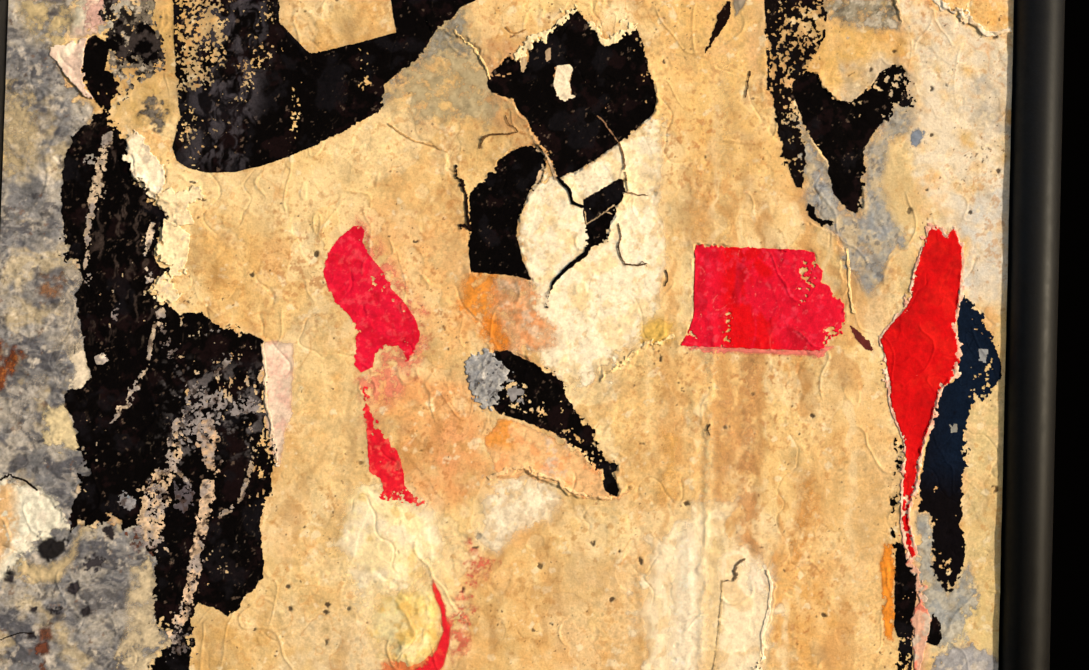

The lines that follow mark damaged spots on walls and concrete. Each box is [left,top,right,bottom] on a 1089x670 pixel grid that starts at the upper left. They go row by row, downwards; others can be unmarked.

crack [388,123,472,230]
crack [479,115,668,308]